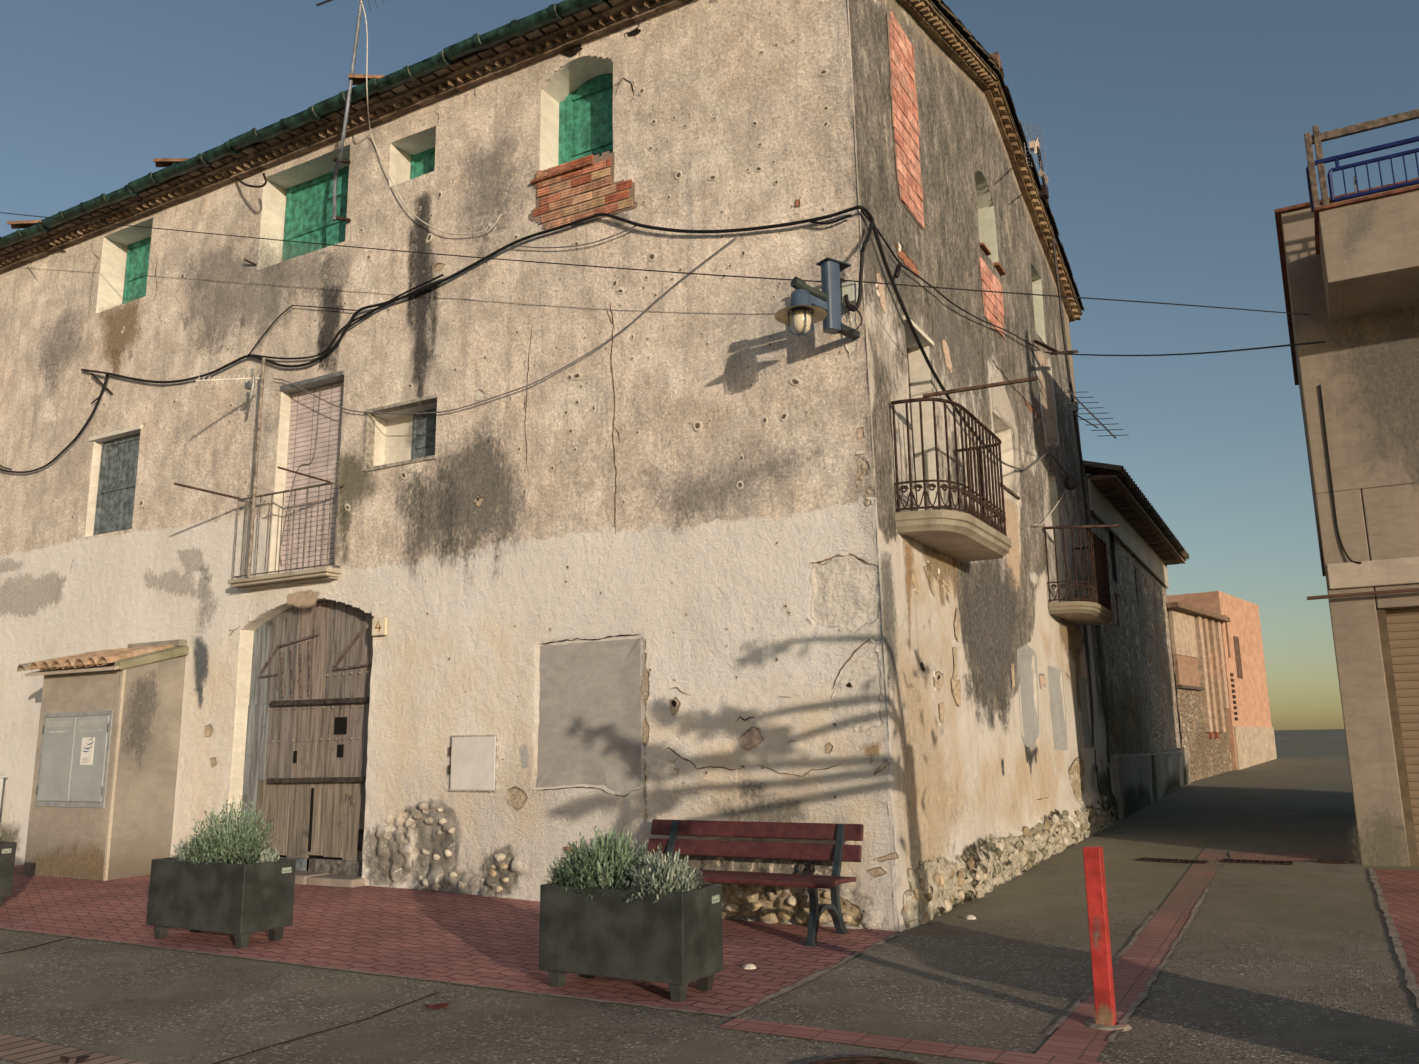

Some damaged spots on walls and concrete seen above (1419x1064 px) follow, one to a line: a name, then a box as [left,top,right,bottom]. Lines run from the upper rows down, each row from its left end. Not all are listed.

water stain [407,194,438,427]
water stain [1036,348,1057,443]
water stain [398,433,521,568]
spalling [783,553,883,754]
water stain [924,546,1018,728]
crack [663,740,839,777]